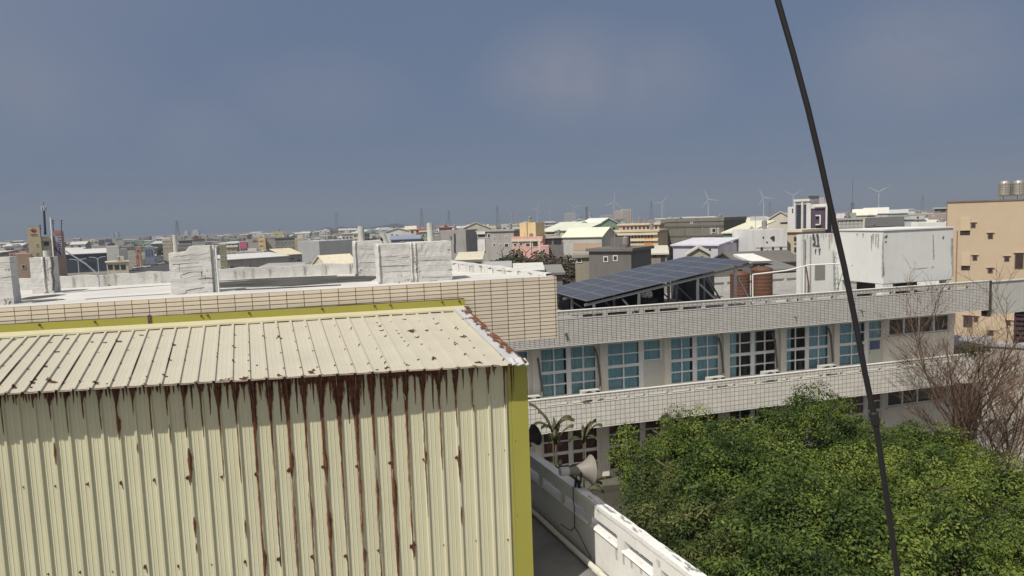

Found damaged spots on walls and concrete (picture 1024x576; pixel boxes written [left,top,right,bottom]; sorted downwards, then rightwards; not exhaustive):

rust [0,310,514,576]